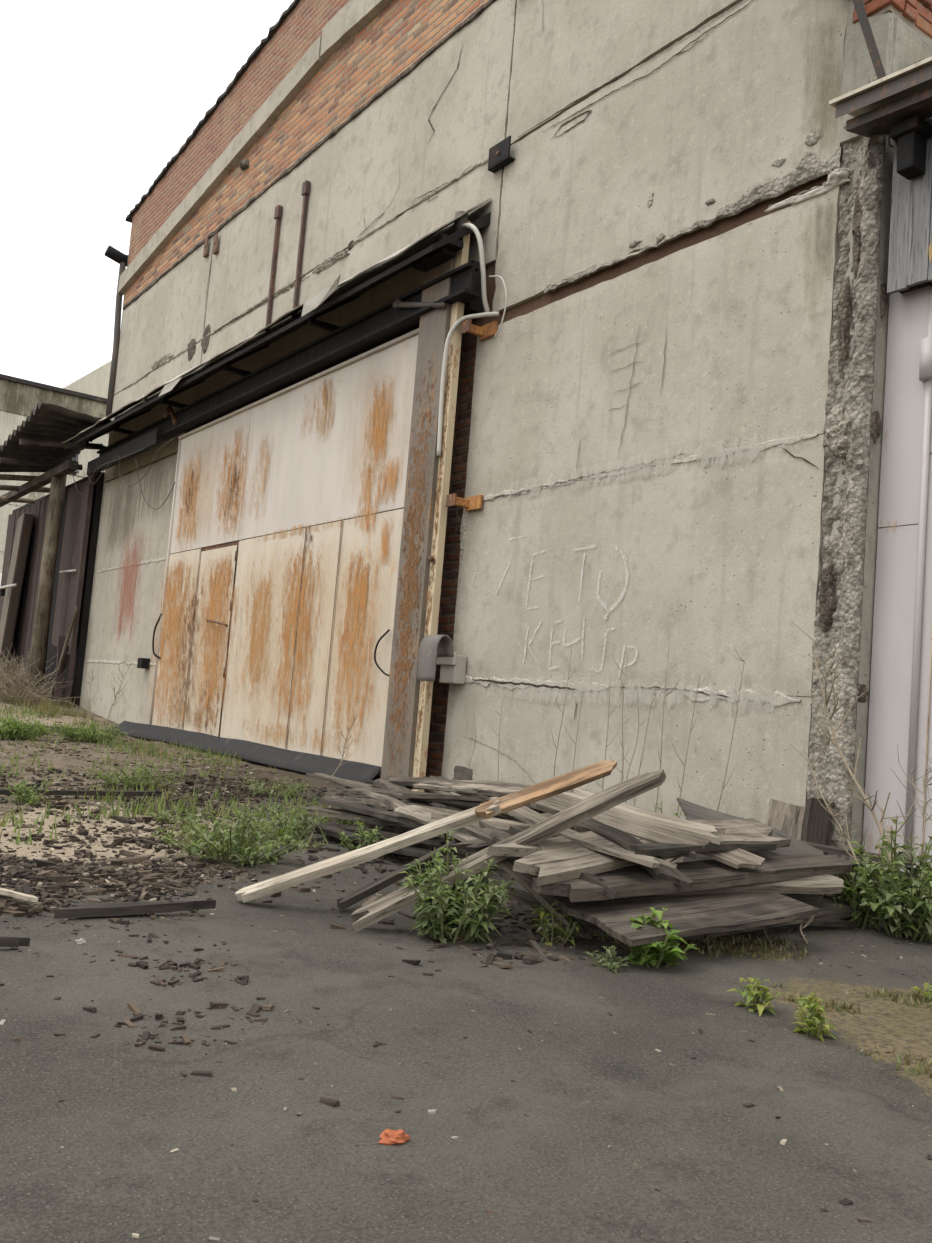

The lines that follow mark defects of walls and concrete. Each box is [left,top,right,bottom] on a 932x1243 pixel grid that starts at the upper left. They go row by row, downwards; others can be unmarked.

crack [519,0,753,138]
crack [352,157,473,246]
crack [201,250,308,355]
corrosion [149,333,454,773]
crack [487,330,687,500]
spalling [544,125,887,879]
crack [780,447,817,468]
crack [472,679,577,719]
crack [621,686,731,698]